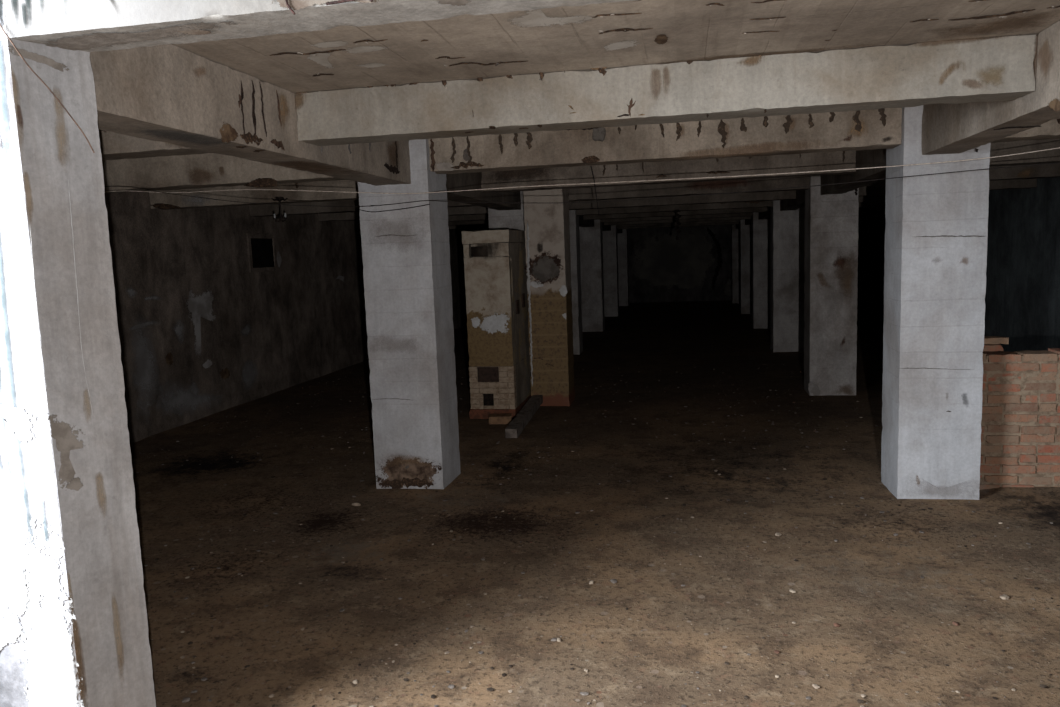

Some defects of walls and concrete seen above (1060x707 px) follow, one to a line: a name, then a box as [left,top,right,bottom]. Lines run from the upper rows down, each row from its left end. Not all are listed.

leakage [0,0,30,26]
spalling [524,243,567,297]
leakage [0,248,15,408]
peeling [471,312,510,334]
leakage [0,437,48,545]
peeling [47,413,86,491]